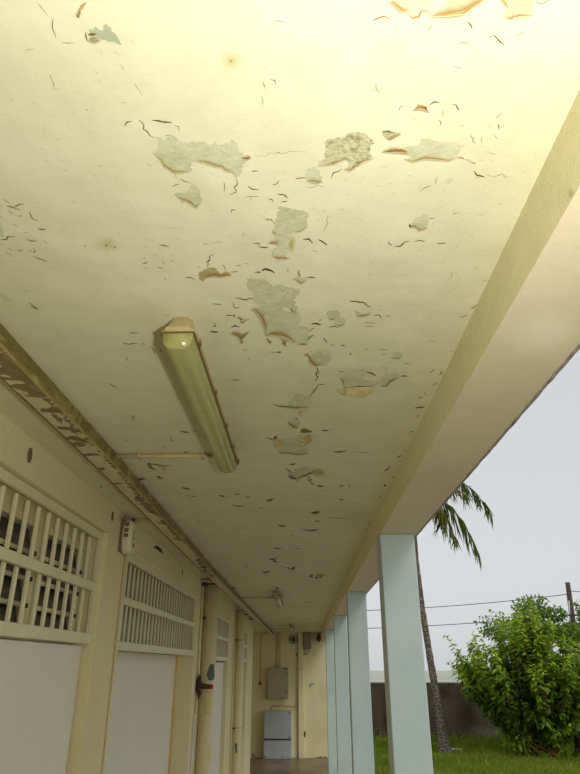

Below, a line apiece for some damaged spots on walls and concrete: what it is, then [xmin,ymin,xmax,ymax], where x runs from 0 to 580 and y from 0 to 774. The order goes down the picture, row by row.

peeling [85,24,122,45]
peeling [389,0,487,31]
peeling [500,0,548,21]
peeling [125,120,251,209]
peeling [296,132,374,188]
peeling [382,130,476,164]
peeling [253,194,326,261]
peeling [186,255,238,281]
peeling [226,268,410,485]
peeling [0,347,185,544]